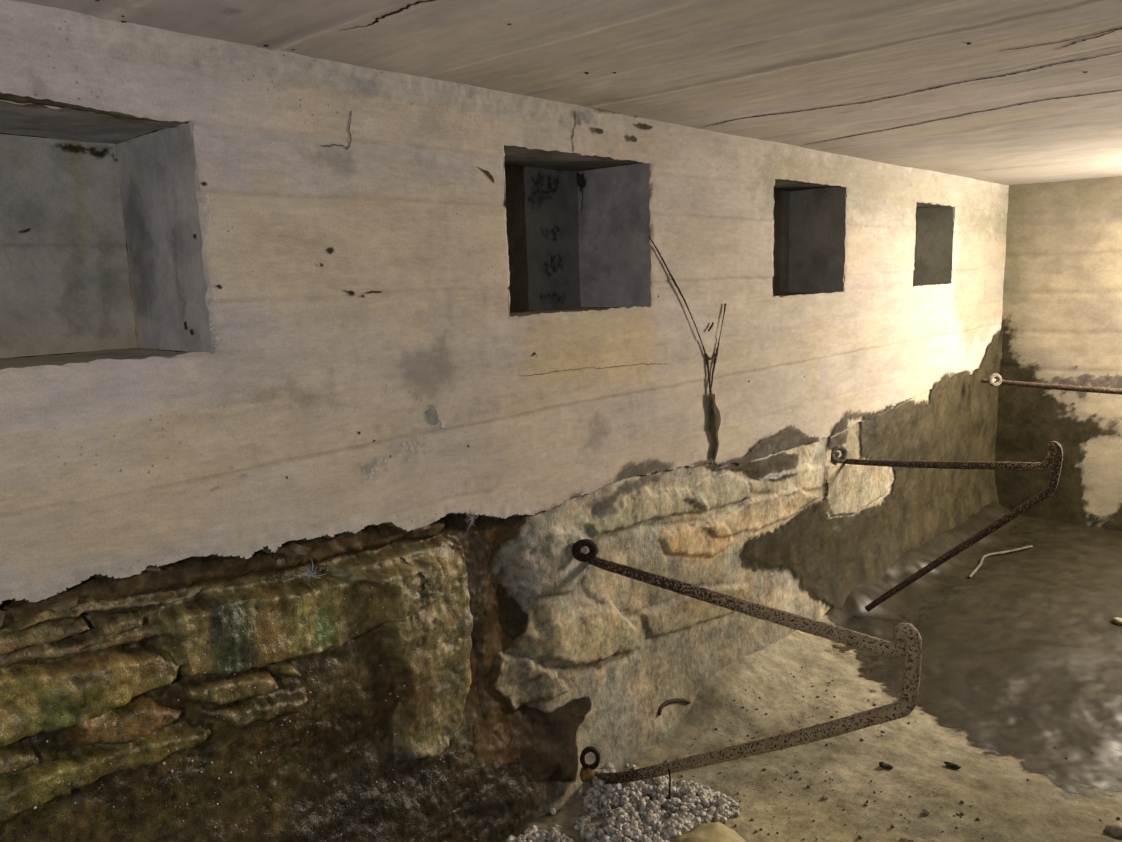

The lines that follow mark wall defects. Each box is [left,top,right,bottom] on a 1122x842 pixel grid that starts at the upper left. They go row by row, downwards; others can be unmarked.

crack [339,0,434,31]
water stain [555,460,673,517]
spalling [0,517,445,631]
water stain [690,319,1122,798]